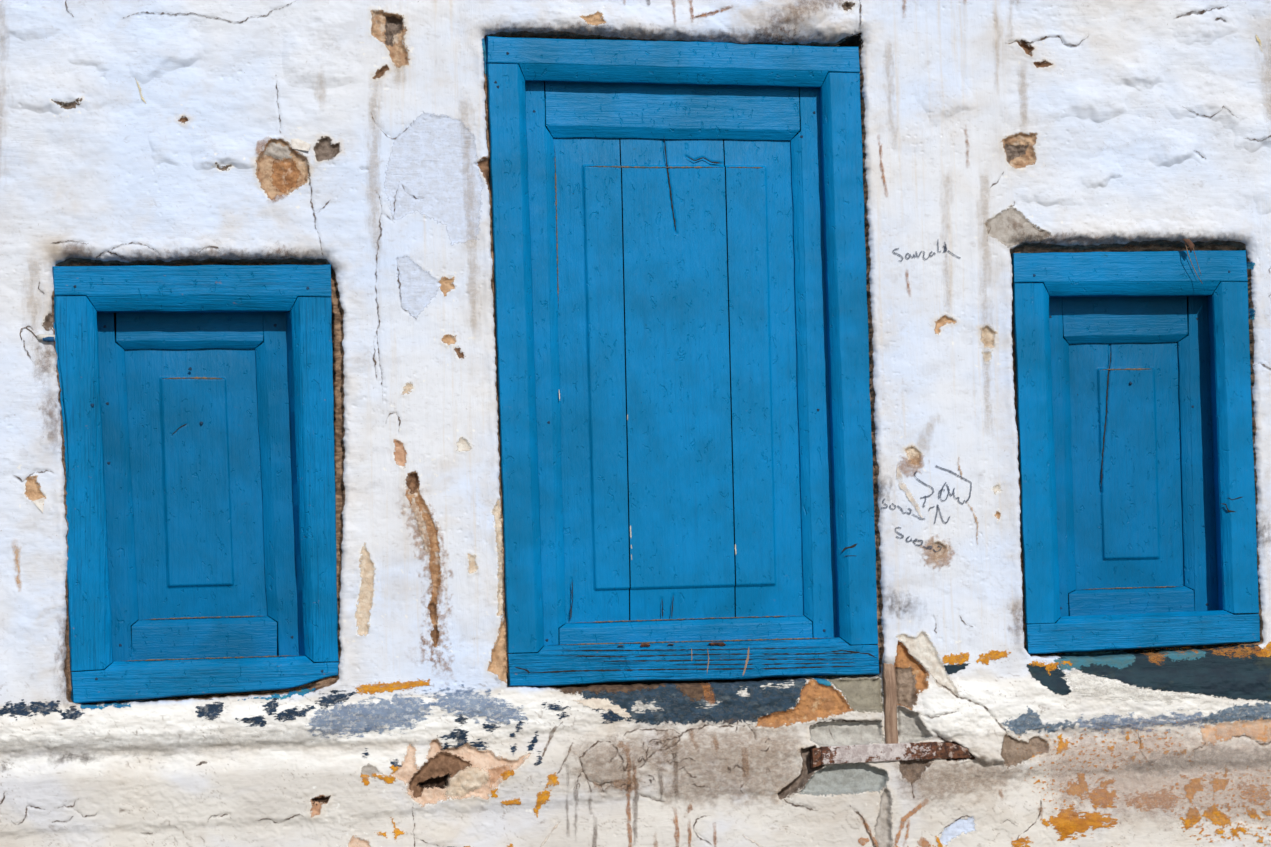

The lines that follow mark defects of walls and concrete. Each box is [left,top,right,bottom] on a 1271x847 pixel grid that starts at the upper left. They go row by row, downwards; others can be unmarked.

flaking render [370,10,411,68]
flaking render [255,138,311,200]
flaking render [1001,132,1037,169]
crack [373,187,417,384]
flaking render [393,439,442,647]
peeling [1134,646,1206,666]
peeling [348,832,387,847]
flaking render [360,730,552,816]
peeling [940,816,975,845]
flaking render [1001,734,1050,769]
peeling [1033,766,1120,841]
peeling [1224,768,1271,816]